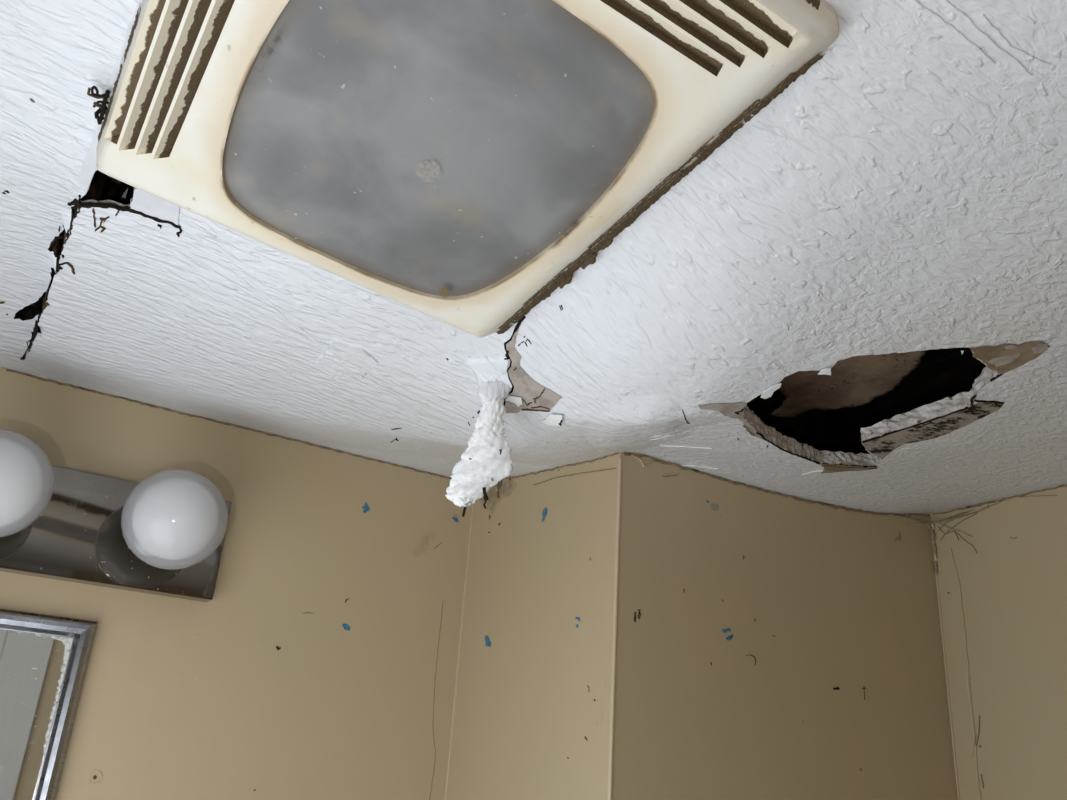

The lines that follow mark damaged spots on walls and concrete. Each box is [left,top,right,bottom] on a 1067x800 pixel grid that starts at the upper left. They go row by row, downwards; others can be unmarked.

crack [0,170,452,484]
peeling [445,316,562,517]
crack [502,452,1067,524]
spalling [739,344,1049,474]